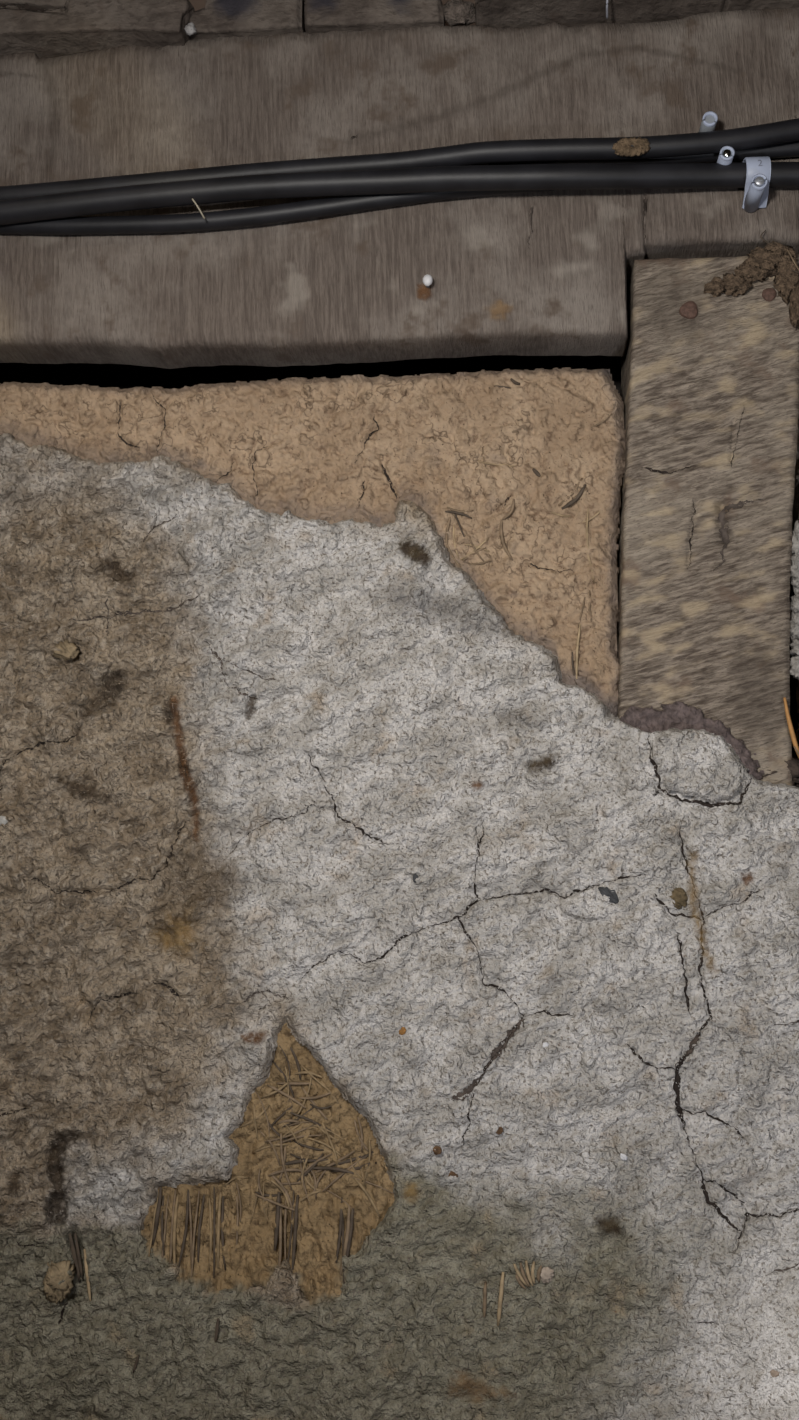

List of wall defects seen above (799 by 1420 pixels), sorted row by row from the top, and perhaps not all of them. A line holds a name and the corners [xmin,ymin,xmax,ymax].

spalling [0,367,764,780]
spalling [141,1023,395,1306]
crack [90,734,799,1250]